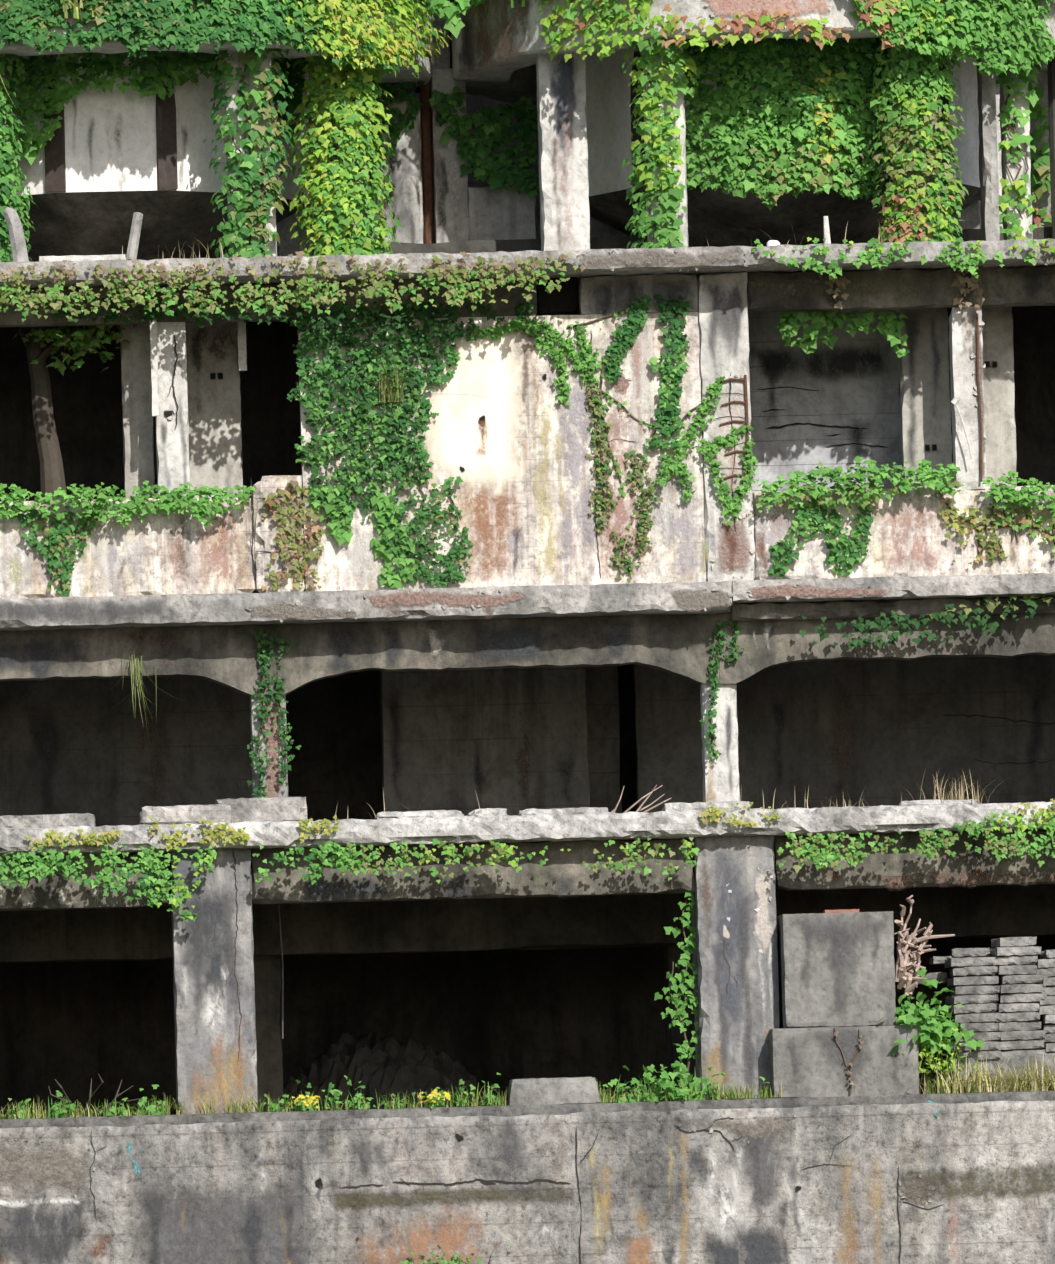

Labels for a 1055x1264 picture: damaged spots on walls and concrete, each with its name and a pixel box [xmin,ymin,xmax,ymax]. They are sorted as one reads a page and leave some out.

water stain [551,57,574,147]
crack [168,332,183,429]
water stain [757,349,883,405]
corrosion [467,495,509,571]
water stain [0,1199,82,1264]
corrosion [370,1221,475,1264]
crack [339,1127,598,1264]